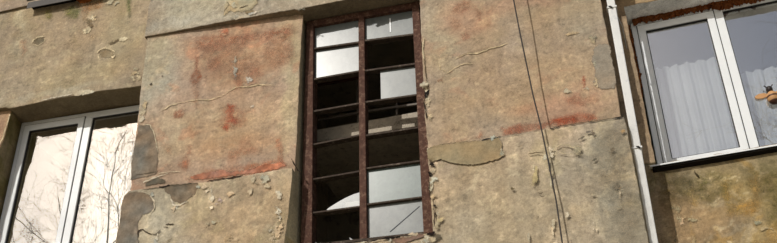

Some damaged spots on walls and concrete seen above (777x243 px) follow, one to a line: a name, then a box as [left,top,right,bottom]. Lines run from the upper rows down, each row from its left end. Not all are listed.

flaking render [223,0,258,20]
spalling [97,37,128,60]
flaking render [137,171,234,212]
flaking render [247,174,283,241]